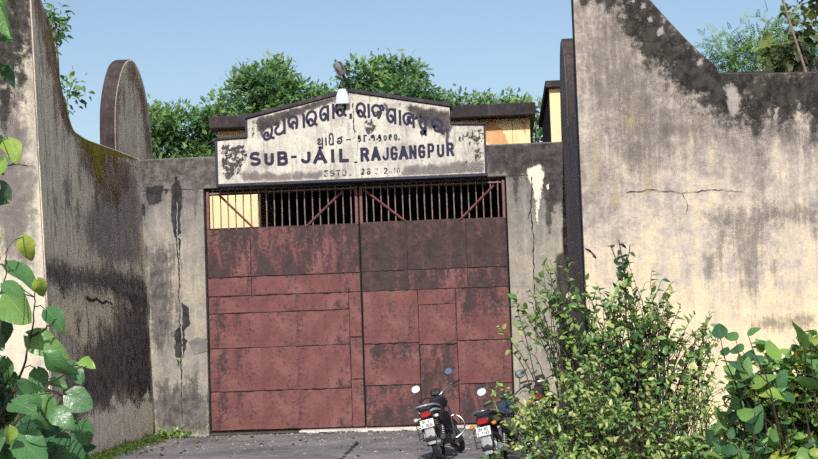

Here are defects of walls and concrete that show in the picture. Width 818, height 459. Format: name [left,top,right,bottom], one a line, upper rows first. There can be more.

leakage [0,56,36,264]
leakage [580,0,655,155]
crack [626,189,732,212]
leakage [750,111,763,137]
leakage [808,100,818,141]
leakage [46,157,216,435]